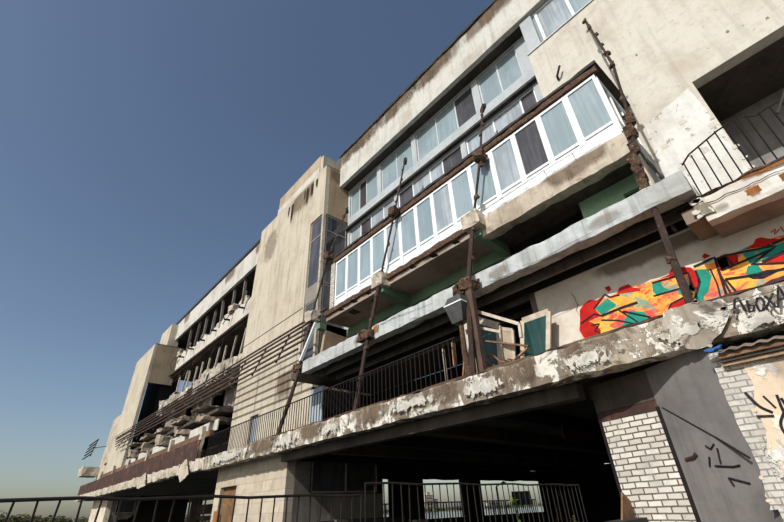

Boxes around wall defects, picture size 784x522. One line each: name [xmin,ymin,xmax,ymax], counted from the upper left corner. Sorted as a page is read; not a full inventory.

damp [467,0,510,38]
damp [333,43,459,183]
spalling [653,299,775,349]
peeling [555,344,623,371]
peeling [463,375,513,399]
peeling [378,394,434,414]
spalling [722,351,784,492]
peeling [274,433,296,448]
peeling [208,448,247,465]
spalling [136,473,146,489]
spalling [177,459,188,482]
spalling [759,471,778,510]